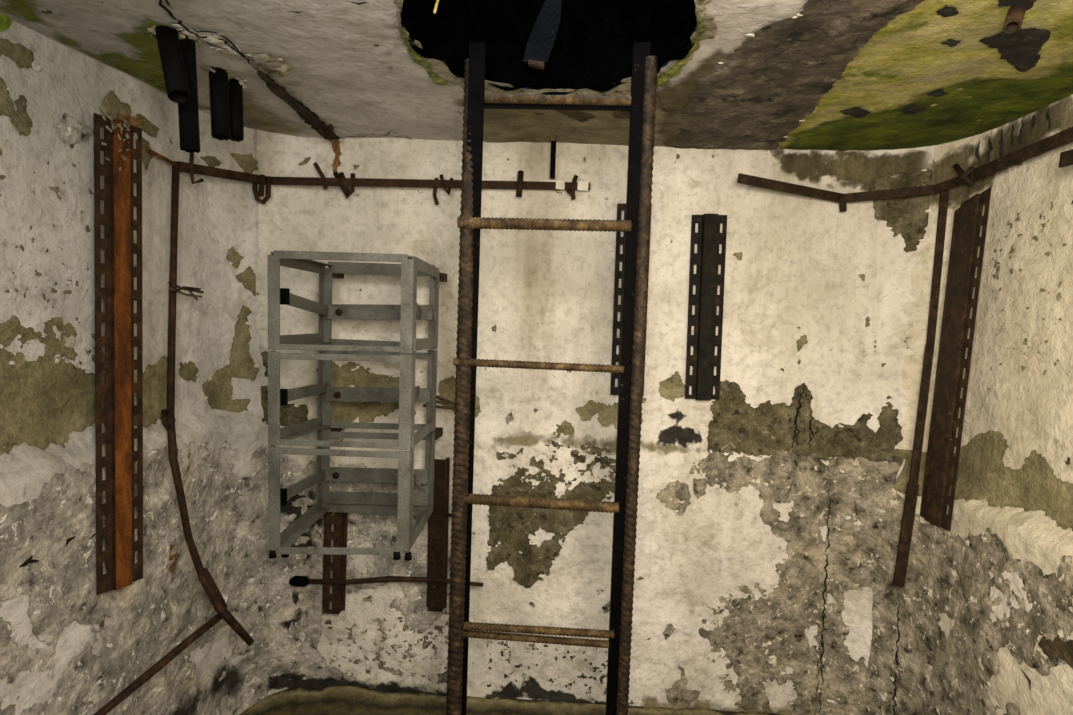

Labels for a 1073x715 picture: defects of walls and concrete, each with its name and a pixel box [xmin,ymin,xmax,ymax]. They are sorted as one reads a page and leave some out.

leakage [936,5,959,17]
peeling [226,247,256,296]
peeling [873,169,933,252]
leakage [774,96,1073,207]
peeling [0,264,106,455]
peeling [134,305,308,428]
crack [791,385,814,449]
peeling [0,437,451,715]
peeling [486,400,618,588]
crack [816,484,831,714]
peeling [656,380,1073,715]
crack [892,591,901,715]